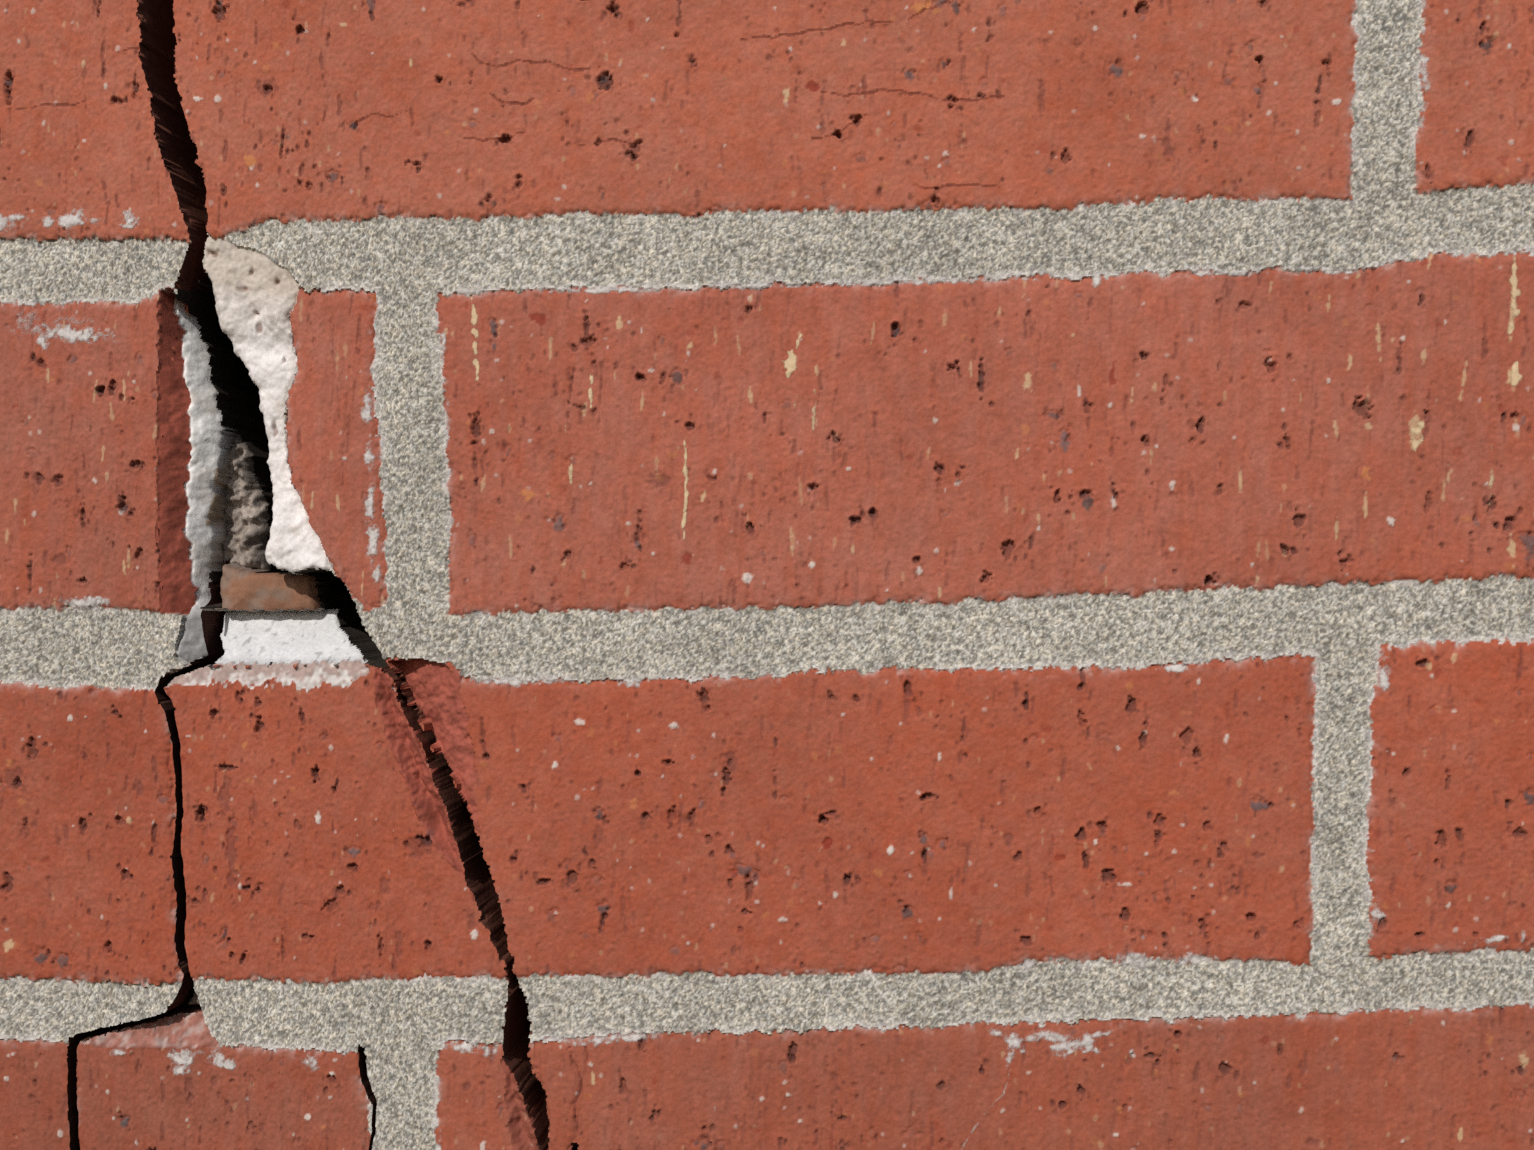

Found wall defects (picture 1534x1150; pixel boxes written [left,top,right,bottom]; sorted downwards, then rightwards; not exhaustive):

crack [67,0,632,1150]
spalling [155,232,563,877]